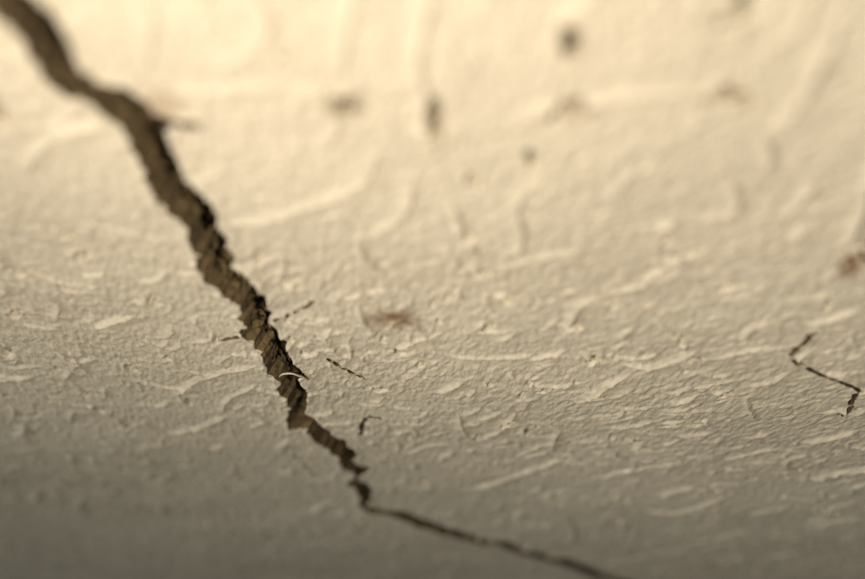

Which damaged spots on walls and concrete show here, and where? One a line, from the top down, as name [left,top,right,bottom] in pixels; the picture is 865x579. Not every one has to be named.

crack [0,0,619,579]
crack [788,332,861,417]